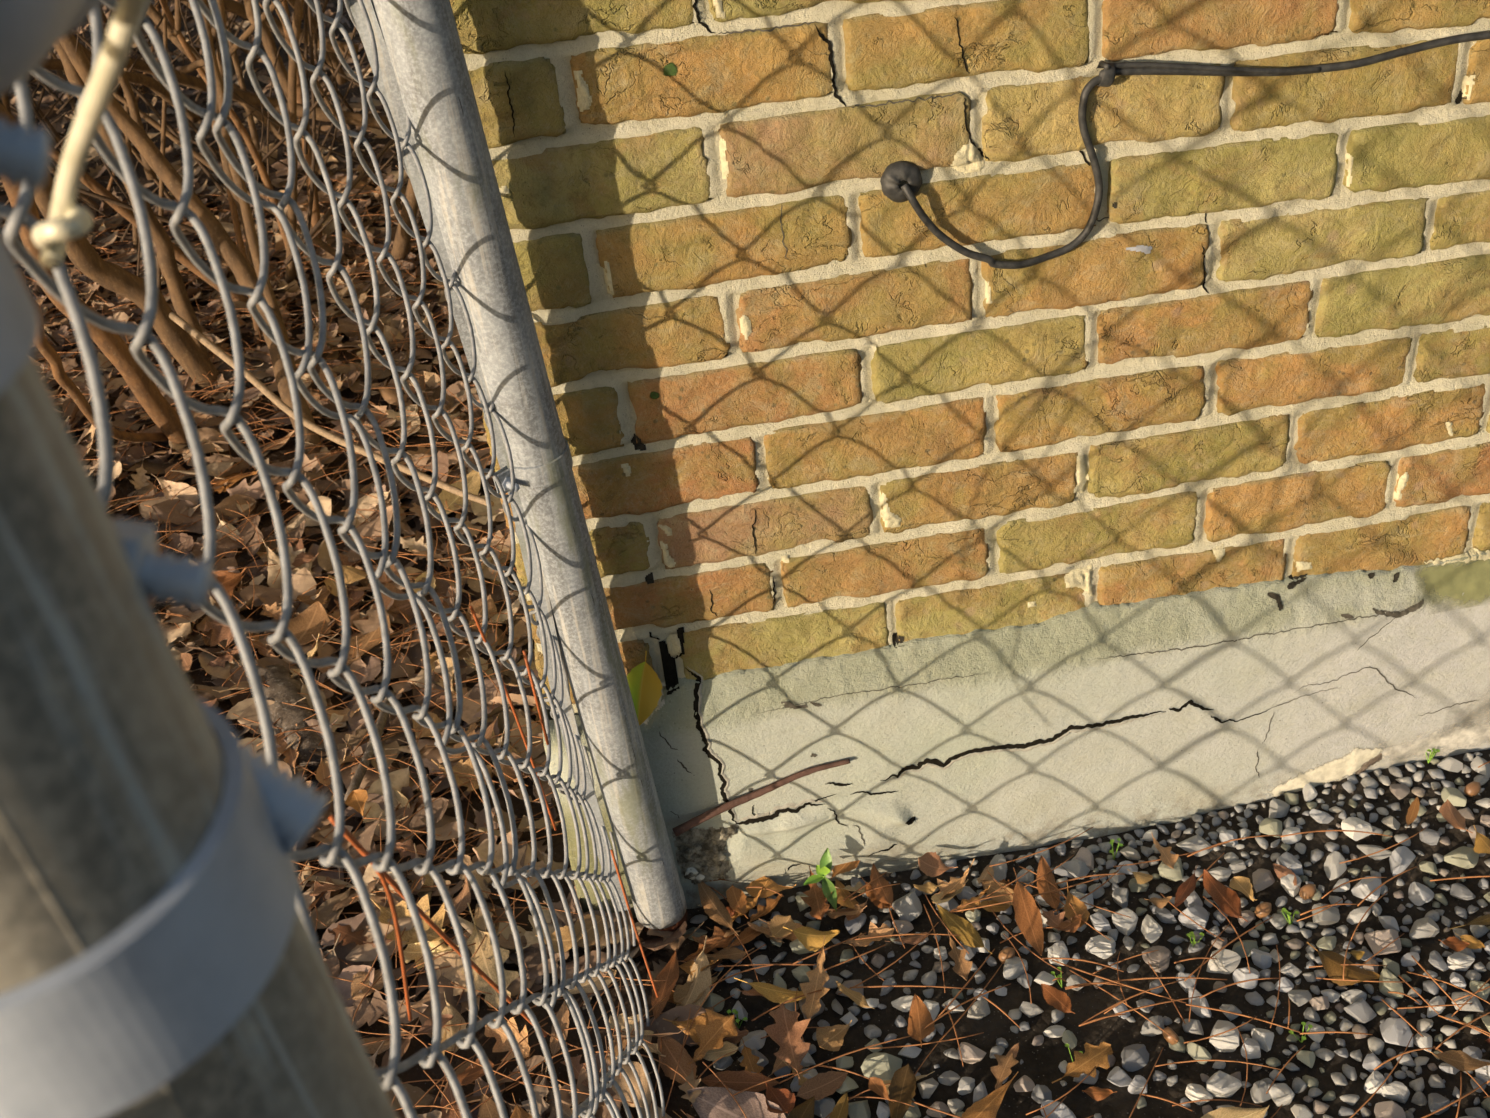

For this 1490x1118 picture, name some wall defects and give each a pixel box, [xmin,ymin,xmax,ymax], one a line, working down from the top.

crack [692,0,989,160]
crack [659,611,1476,856]
spalling [672,824,739,885]